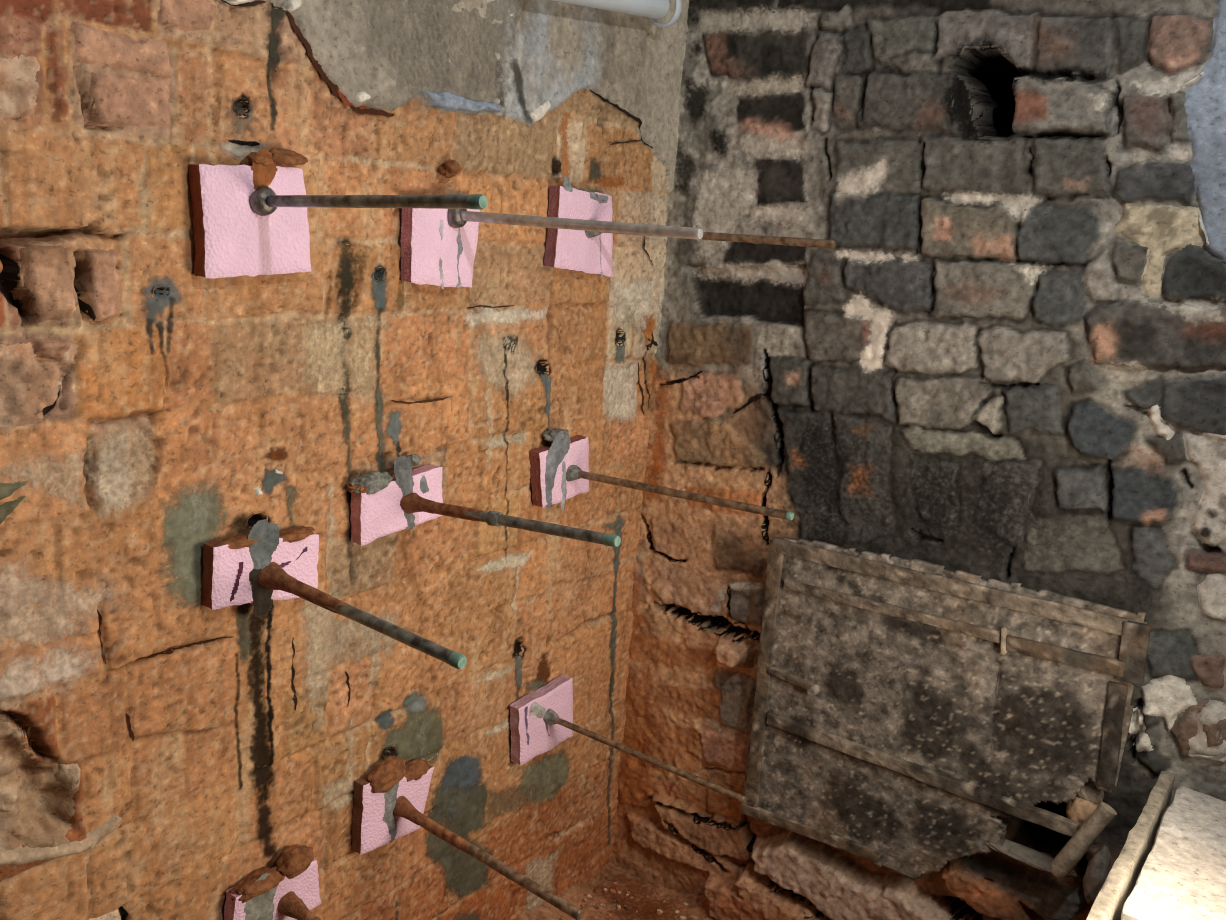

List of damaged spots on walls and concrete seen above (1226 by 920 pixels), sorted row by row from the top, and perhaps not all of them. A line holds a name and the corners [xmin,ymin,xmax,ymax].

spalling [0,54,40,121]
flaking render [70,0,689,193]
spalling [0,235,122,326]
spalling [0,339,79,429]
crack [643,516,686,562]
crack [661,586,760,642]
damp [235,603,277,857]
spalling [0,710,122,866]